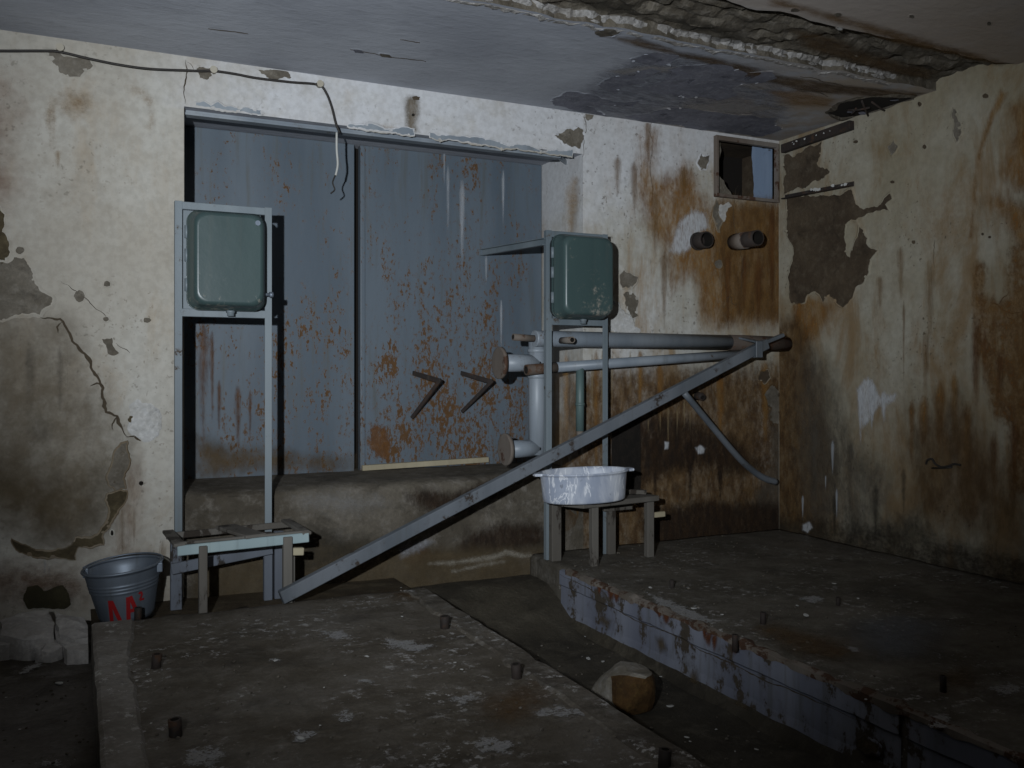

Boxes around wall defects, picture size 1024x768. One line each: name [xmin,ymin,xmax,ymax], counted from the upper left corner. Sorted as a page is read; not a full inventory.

peeling [42,47,96,79]
spalling [447,0,924,120]
peeling [429,91,783,172]
peeling [0,205,57,323]
peeling [613,268,639,319]
peeling [782,132,896,309]
crack [41,317,141,441]
rust [563,162,832,549]
peeling [10,416,144,561]
rust [201,445,289,473]
rust [367,424,391,460]
water stain [654,366,1024,584]